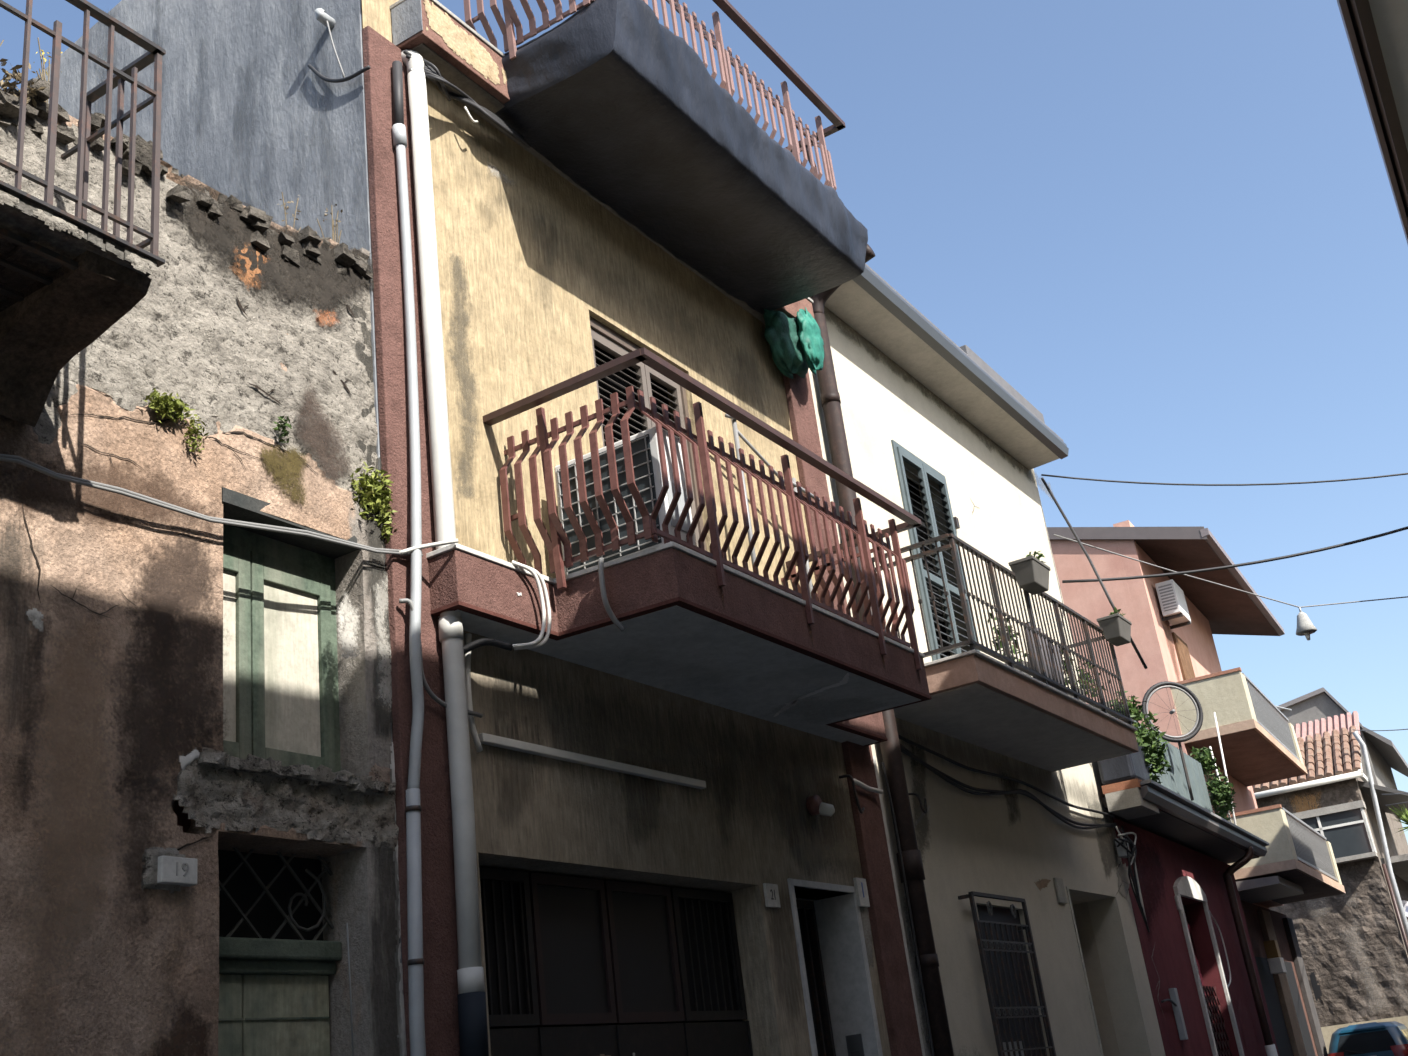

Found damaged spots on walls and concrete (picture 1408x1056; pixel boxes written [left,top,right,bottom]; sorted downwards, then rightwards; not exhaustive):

flaking render [0,116,379,491]
water stain [0,424,223,922]
spalling [179,742,396,822]
water stain [147,994,209,1056]
peeling [393,842,407,1056]